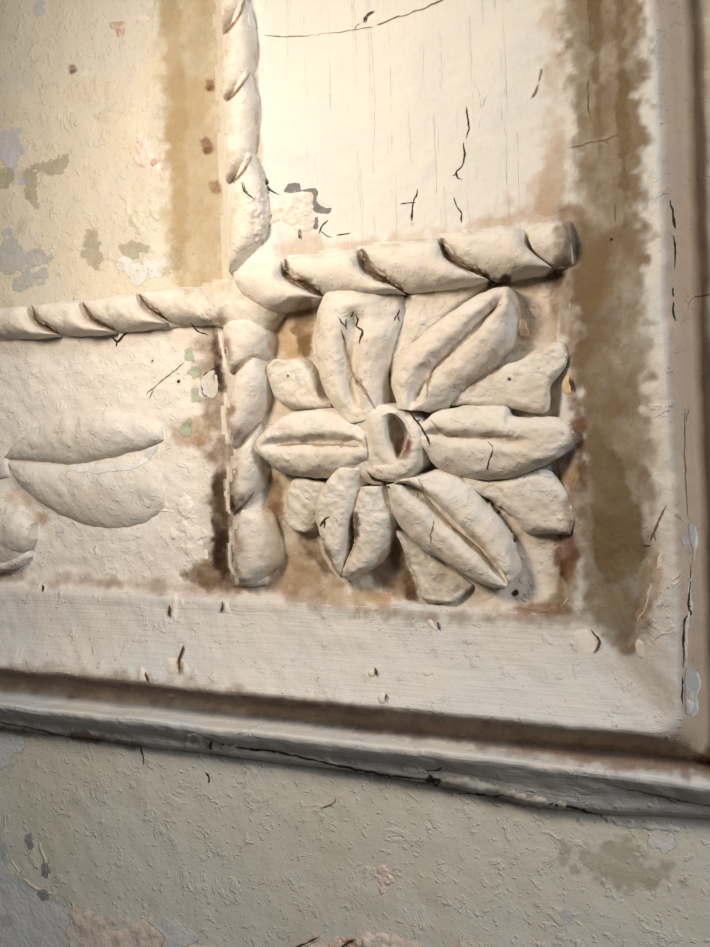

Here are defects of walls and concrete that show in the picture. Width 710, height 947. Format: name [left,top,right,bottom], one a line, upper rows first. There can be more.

crack [267,0,443,37]
flaking render [241,45,333,243]
crack [681,569,693,703]
peeling [0,735,26,771]
flaking render [425,774,567,813]
flaking render [600,814,680,850]
peeling [0,822,215,947]
flaking render [287,924,422,947]